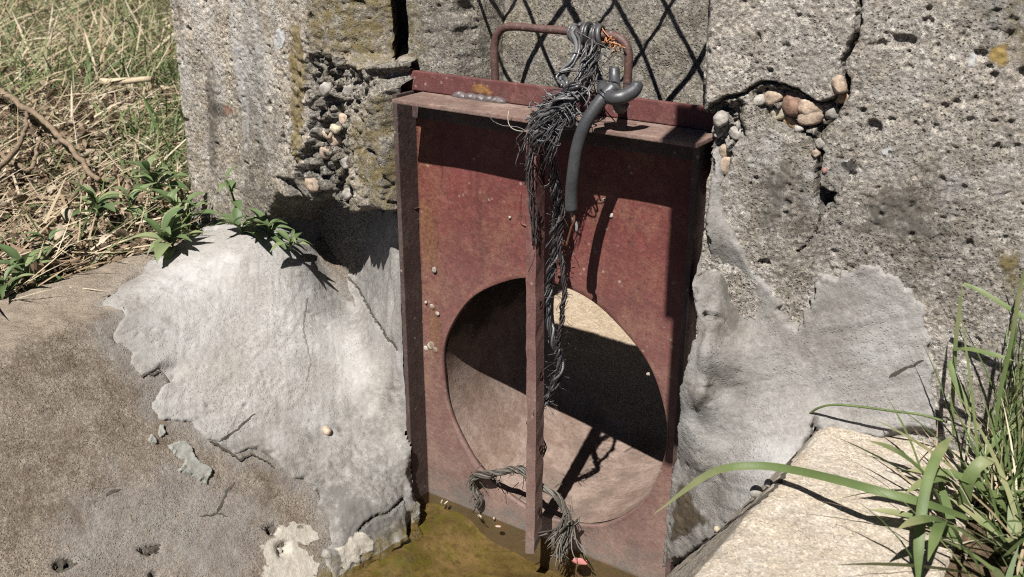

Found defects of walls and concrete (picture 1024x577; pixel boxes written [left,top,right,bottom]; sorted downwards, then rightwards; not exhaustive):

spalling [276,52,415,212]
spalling [704,75,850,213]
crack [708,0,864,249]
peeling [148,424,212,485]
crack [201,414,273,517]